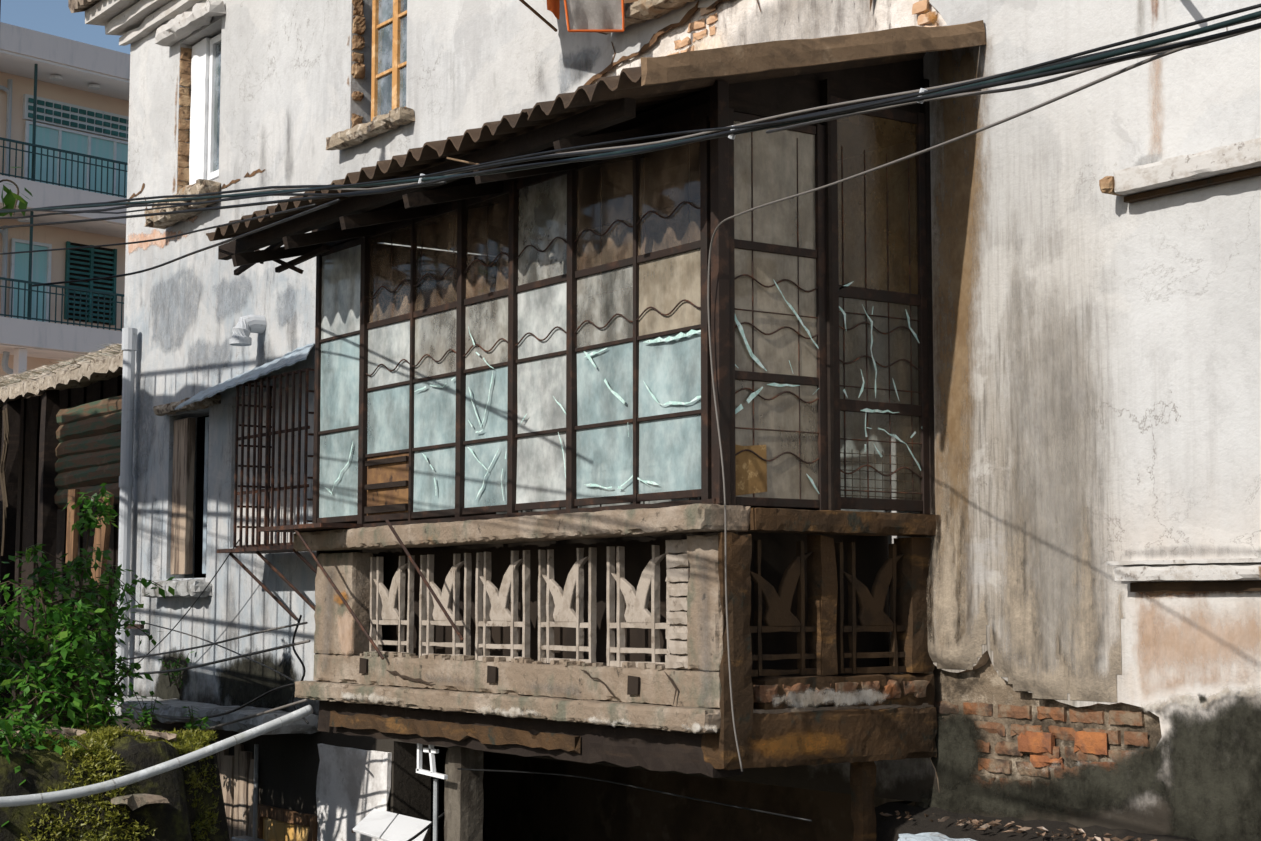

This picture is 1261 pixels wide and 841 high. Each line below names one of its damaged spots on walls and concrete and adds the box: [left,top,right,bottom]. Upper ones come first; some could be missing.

peeling [560,0,947,93]
flaking render [177,47,192,193]
water stain [1138,591,1261,667]
spalling [753,651,1167,820]
water stain [1144,682,1261,841]